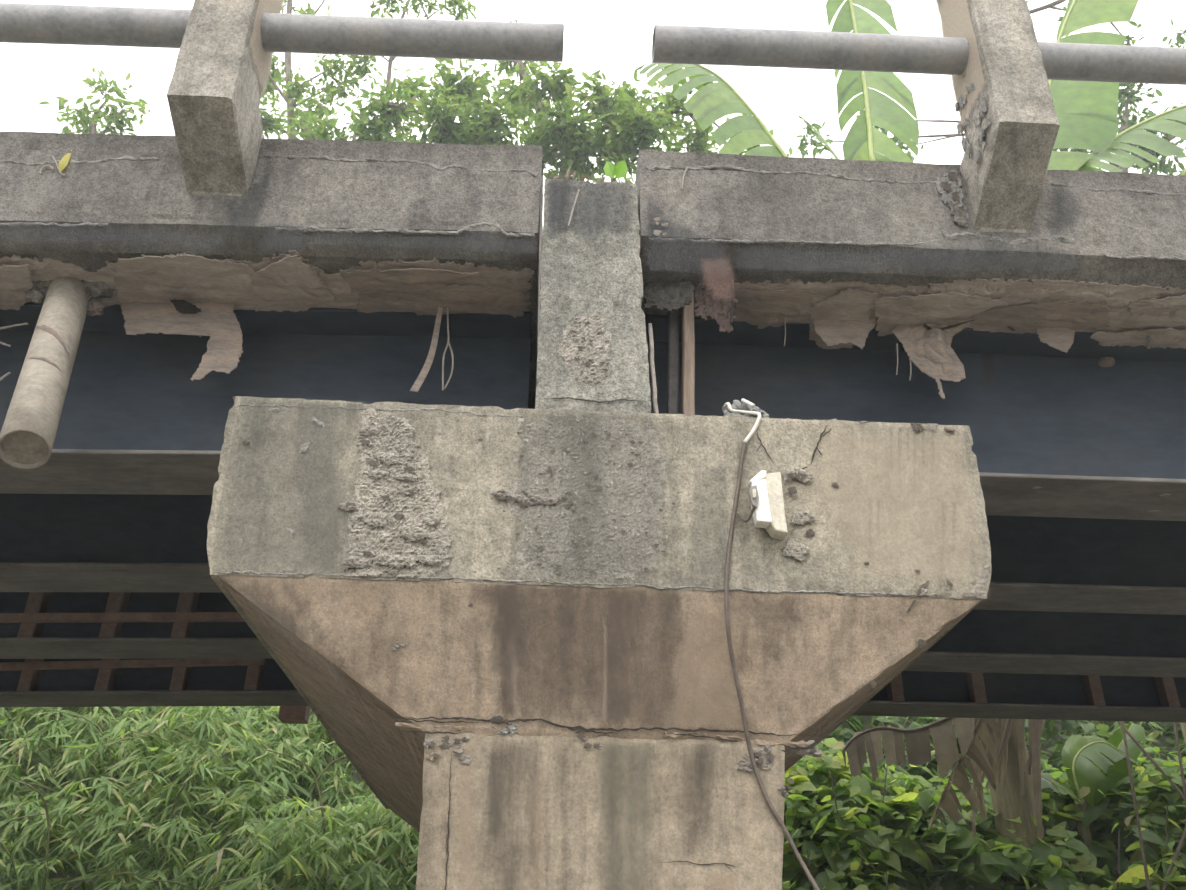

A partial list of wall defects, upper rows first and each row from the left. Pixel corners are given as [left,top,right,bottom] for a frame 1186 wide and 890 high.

peeling [955,83,990,164]
spalling [936,170,969,227]
peeling [0,264,34,311]
peeling [111,253,335,312]
peeling [357,283,528,318]
peeling [733,289,1186,349]
crack [802,425,832,469]
peeling [346,439,443,568]
crack [395,717,821,890]